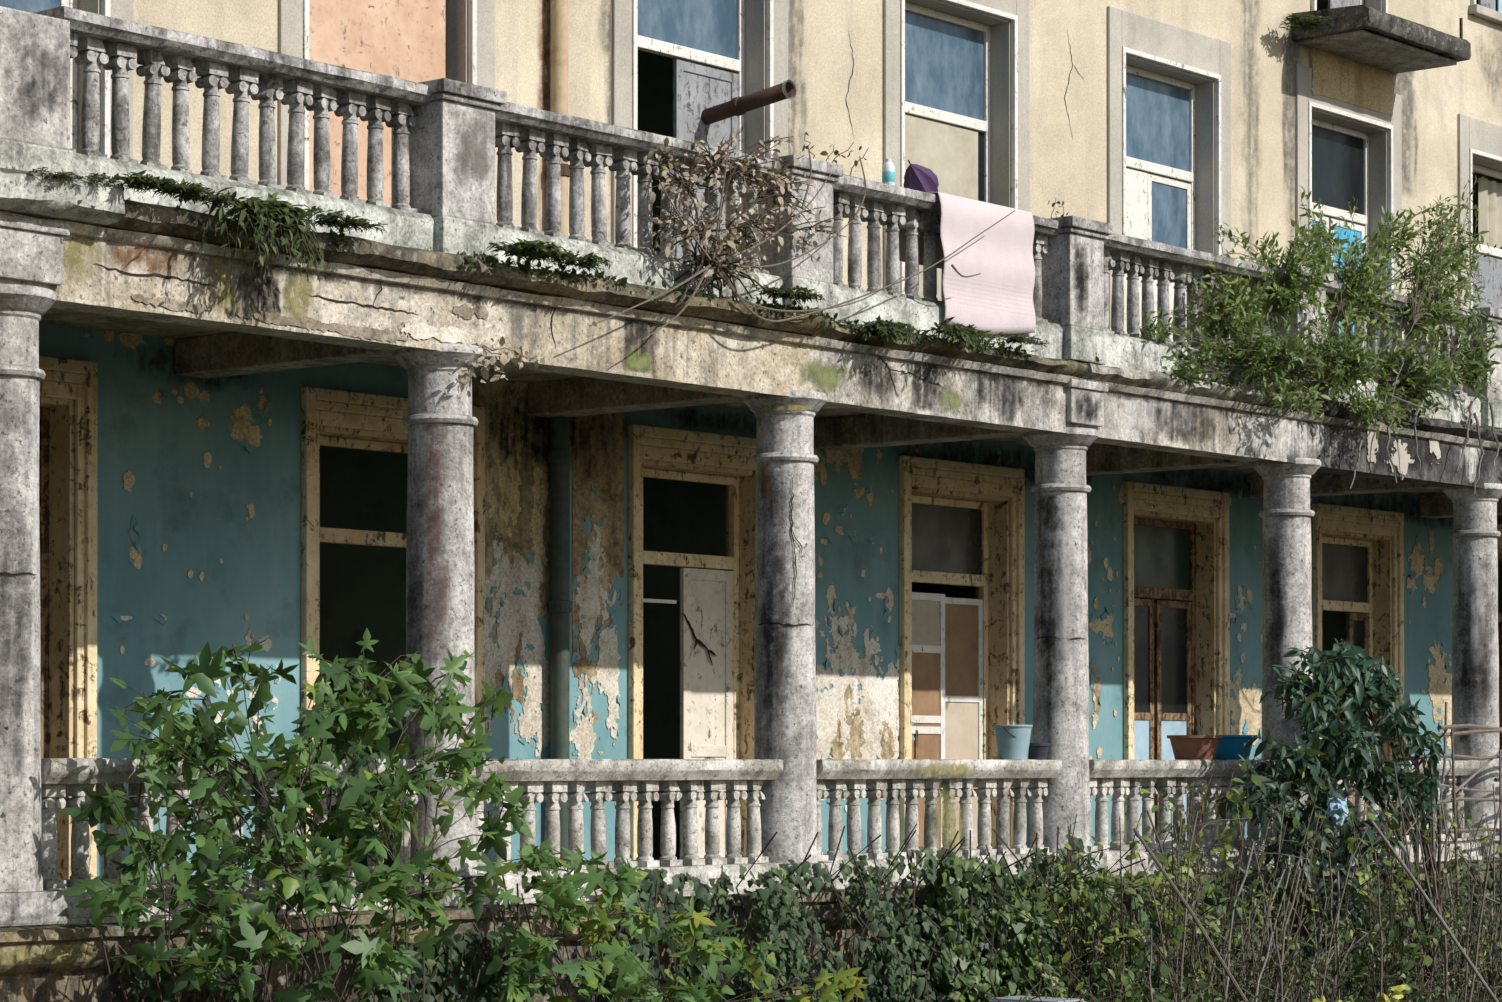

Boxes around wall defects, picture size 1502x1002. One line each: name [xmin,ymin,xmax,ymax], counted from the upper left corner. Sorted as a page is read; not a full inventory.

crack [846,35,854,136]
crack [1064,32,1083,137]
damp [381,281,657,359]
damp [865,356,942,408]
damp [906,442,1035,484]
damp [965,369,1066,414]
spalling [1366,400,1442,480]
peeling [472,377,550,759]
peeling [569,412,625,759]
peeling [814,448,915,759]
damp [1040,496,1070,686]
peeling [1408,640,1452,760]